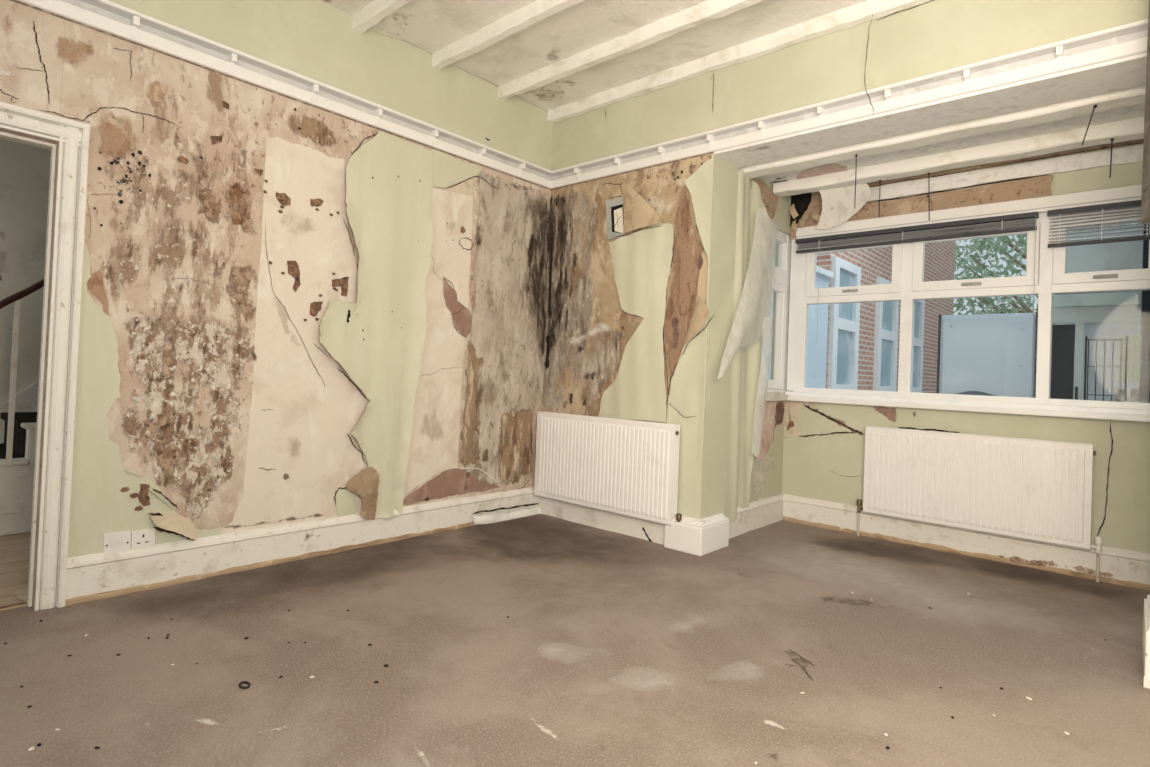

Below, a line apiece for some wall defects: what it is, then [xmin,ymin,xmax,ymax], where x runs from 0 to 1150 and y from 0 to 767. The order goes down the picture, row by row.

crack [0,20,176,133]
flaking render [254,168,291,213]
flaking render [310,198,339,216]
flaking render [790,192,822,239]
flaking render [846,139,1144,222]
flaking render [269,261,301,293]
flaking render [304,272,349,321]
flaking render [434,271,472,337]
leakage [460,171,624,485]
peeling [754,401,864,463]
flaking render [138,484,150,506]
flaking render [403,467,499,505]